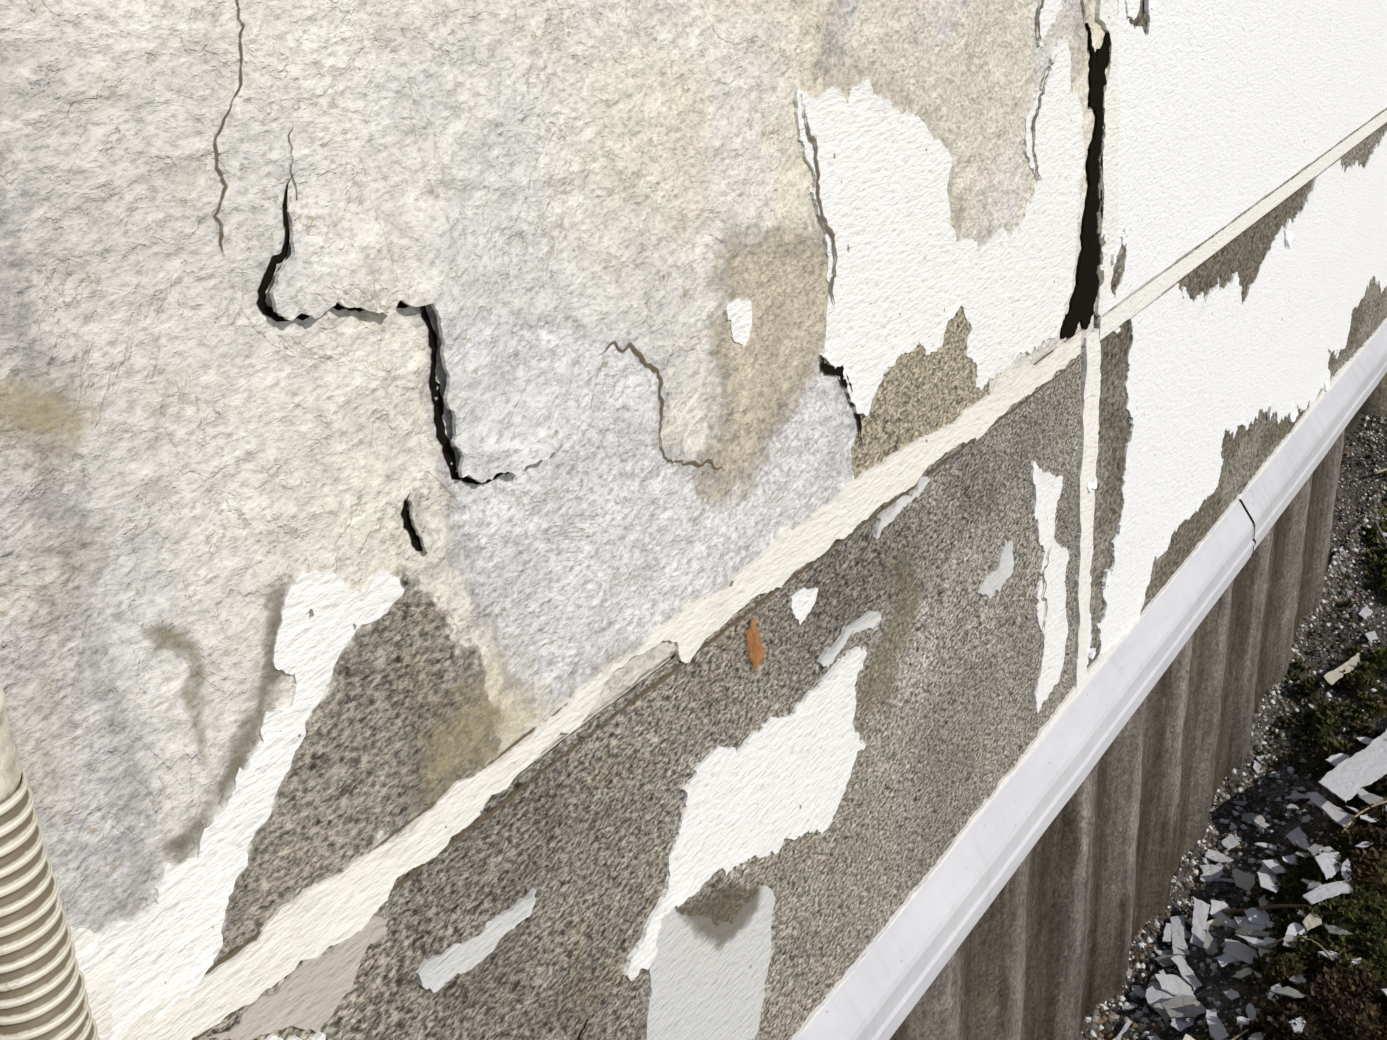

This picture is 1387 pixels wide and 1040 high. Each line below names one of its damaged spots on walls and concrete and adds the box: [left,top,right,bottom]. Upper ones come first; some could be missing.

crack [214,0,245,256]
crack [257,124,724,485]
peeling [814,0,1089,247]
crack [1032,0,1111,339]
peeling [1162,177,1315,303]
peeling [1335,122,1387,173]
peeling [0,254,151,933]
crack [401,487,436,553]
peeling [208,225,1132,1040]
rust [747,617,765,666]
peeling [1140,277,1387,614]
peeling [192,968,296,1040]